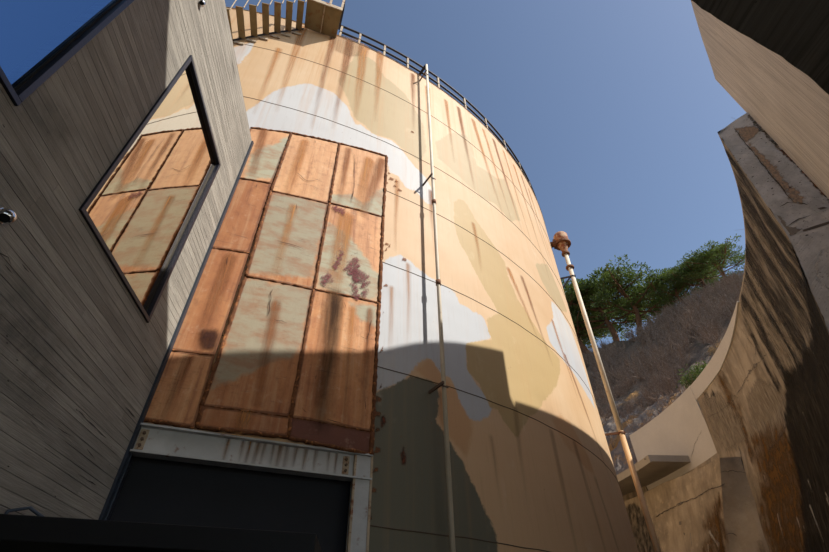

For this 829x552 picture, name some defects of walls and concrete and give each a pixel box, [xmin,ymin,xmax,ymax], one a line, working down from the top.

corrosion [342,39,367,77]
corrosion [200,330,219,349]
corrosion [266,301,277,353]
corrosion [321,292,341,394]
damp [703,150,829,552]
crack [656,446,744,517]
damp [627,504,654,552]